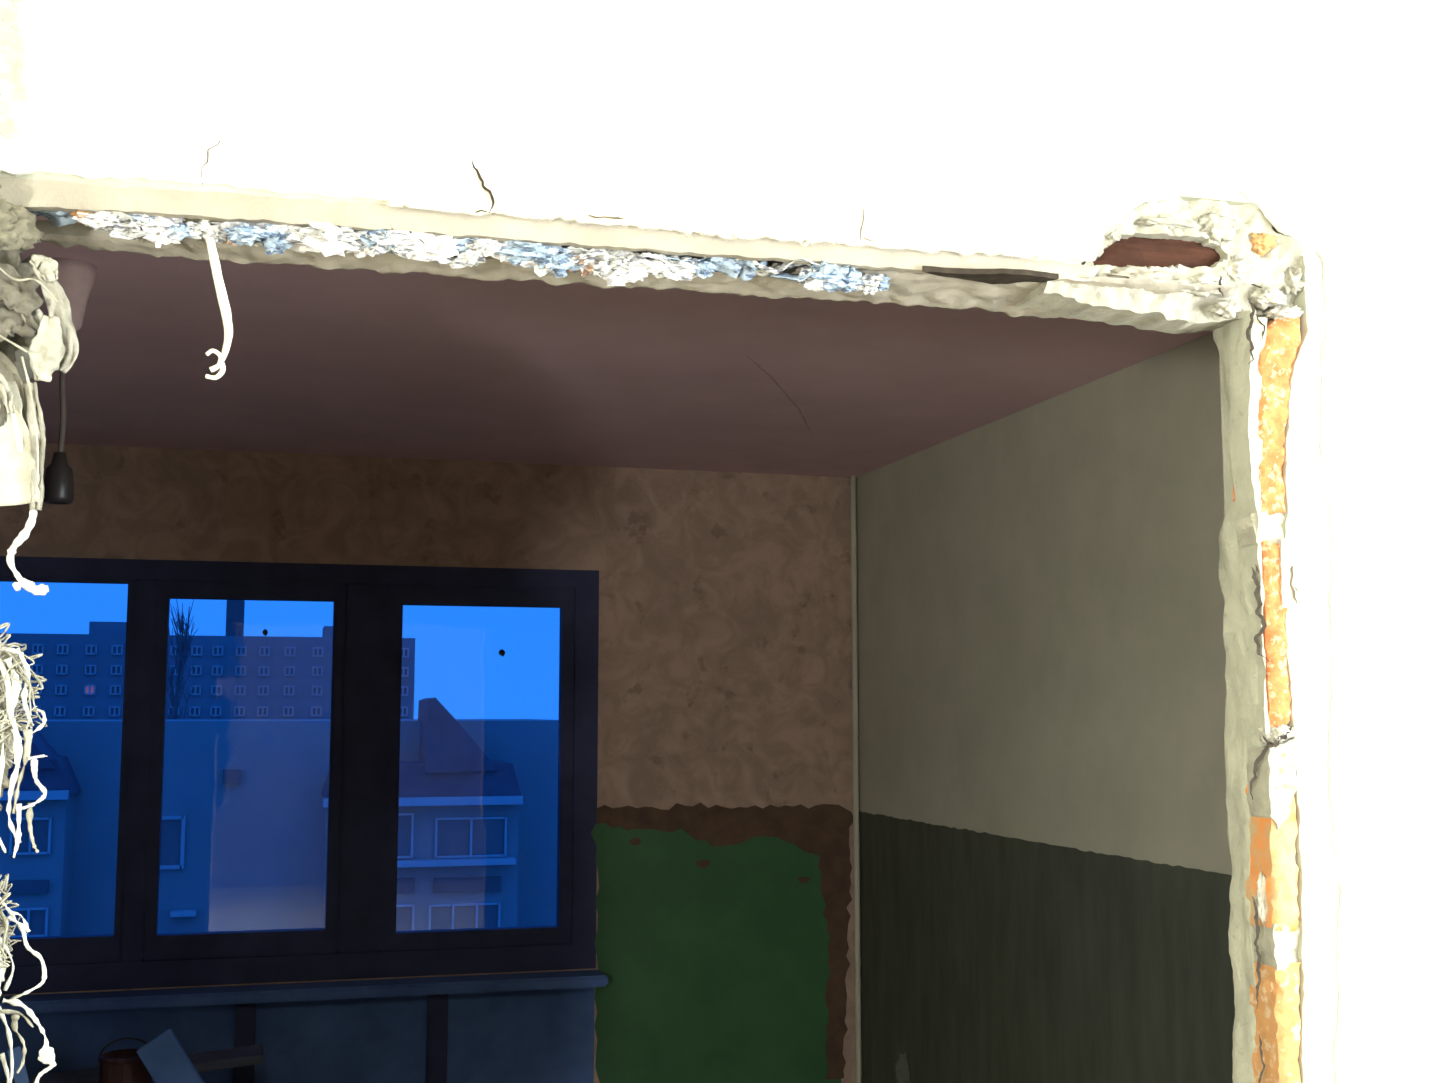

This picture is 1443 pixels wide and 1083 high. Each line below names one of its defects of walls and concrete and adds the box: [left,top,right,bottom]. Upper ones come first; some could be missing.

crack [472,160,495,213]
peeling [387,164,1316,1083]
crack [1251,565,1298,660]
crack [1250,726,1292,800]
crack [1252,896,1265,1083]